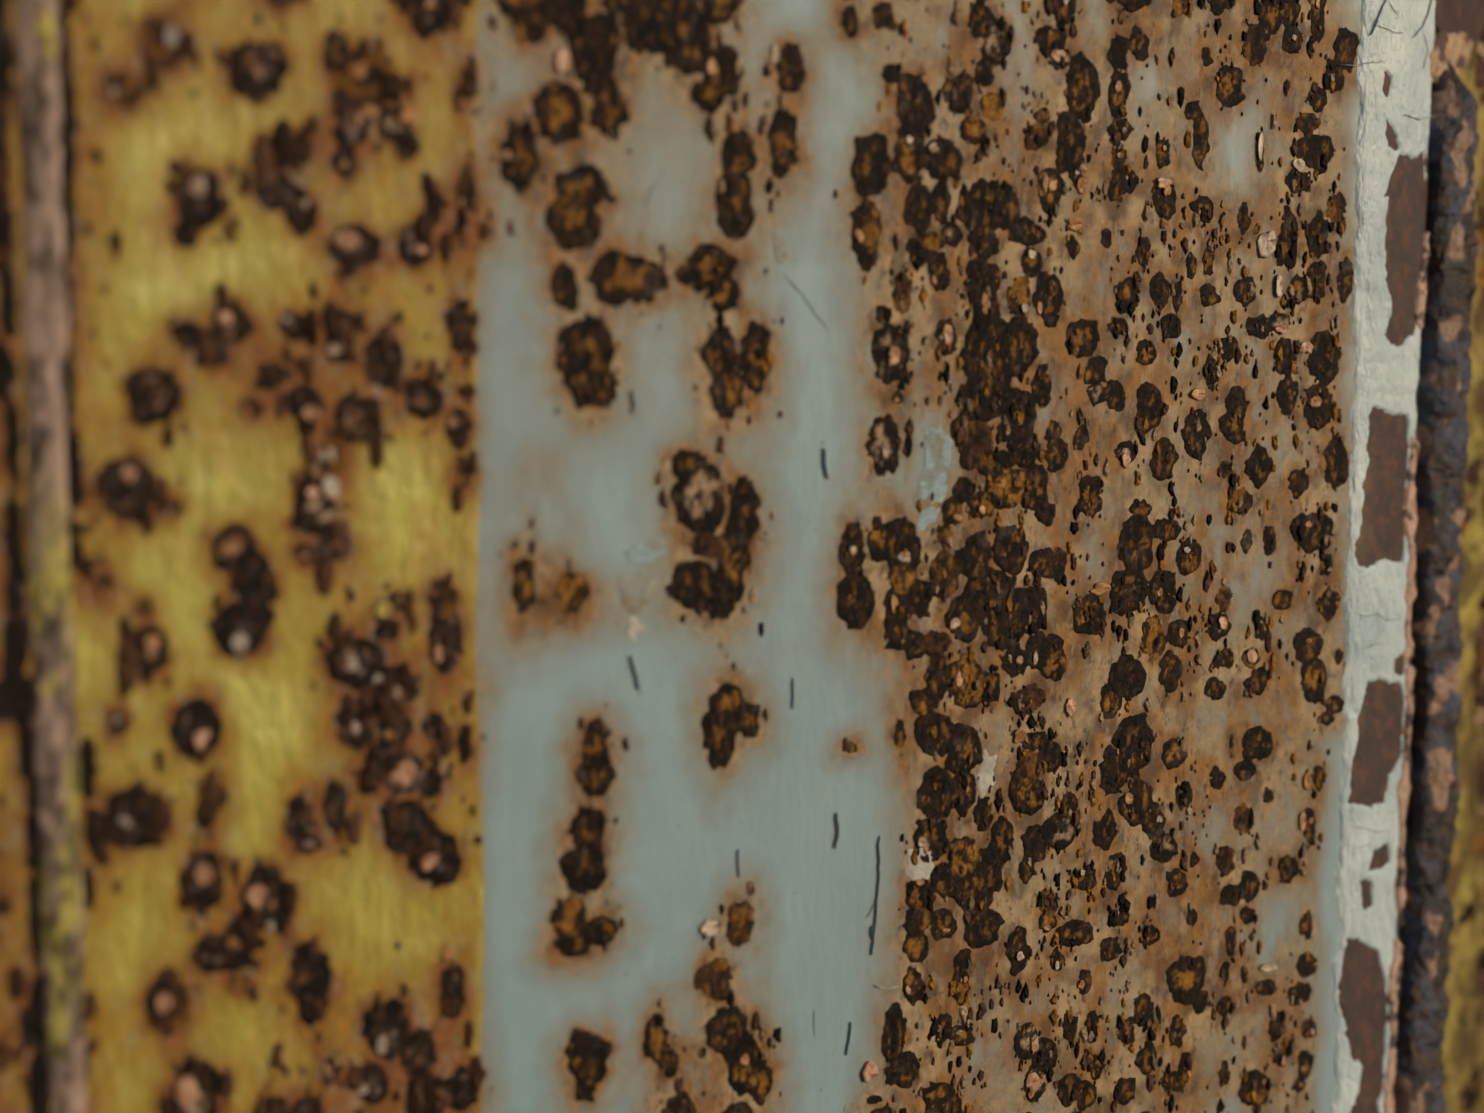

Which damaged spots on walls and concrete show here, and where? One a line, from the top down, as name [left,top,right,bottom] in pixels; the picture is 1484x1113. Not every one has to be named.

corrosion [1474,28,1484,105]
peeling [1384,119,1431,347]
corrosion [1474,187,1484,313]
corrosion [0,0,817,1113]
corrosion [827,0,1361,1113]
corrosion [1461,457,1484,538]
corrosion [1471,595,1484,731]
peeling [1334,407,1421,1113]
corrosion [1459,886,1484,926]
corrosion [1461,947,1484,1025]